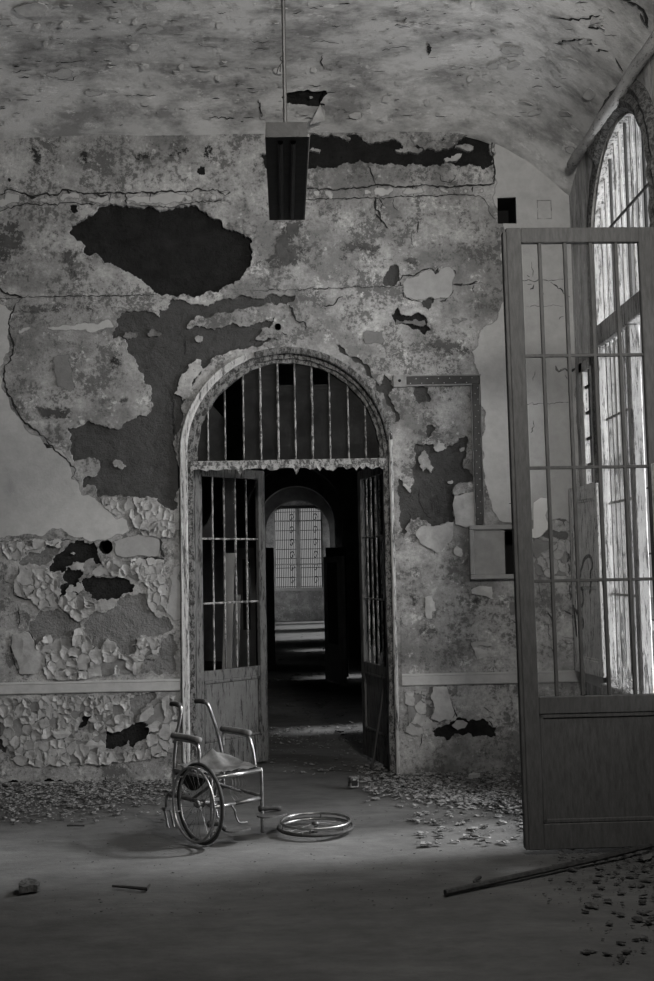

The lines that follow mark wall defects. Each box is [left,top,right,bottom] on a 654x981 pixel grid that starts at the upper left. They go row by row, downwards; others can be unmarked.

crack [0,2,147,126]
crack [155,0,268,122]
crack [293,0,453,119]
spalling [282,90,492,169]
crack [0,188,231,211]
peeling [265,220,310,272]
spalling [383,257,418,286]
spalling [392,298,469,355]
spalling [37,205,295,538]
spalling [413,386,431,404]
spalling [397,425,476,557]
peeling [471,586,493,603]